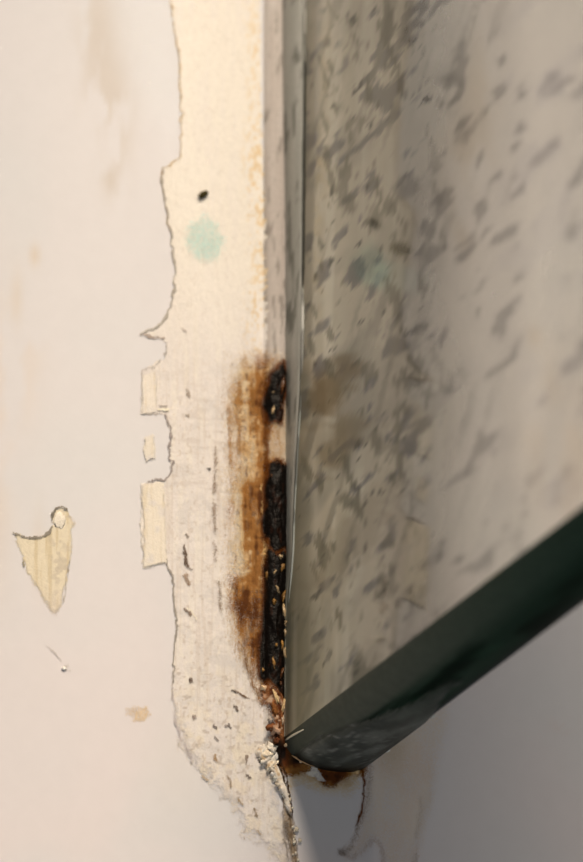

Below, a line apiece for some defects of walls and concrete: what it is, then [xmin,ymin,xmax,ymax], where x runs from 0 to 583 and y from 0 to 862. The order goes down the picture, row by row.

peeling [13,506,76,614]
peeling [139,0,292,862]
crack [277,757,302,862]
rust [211,345,369,826]